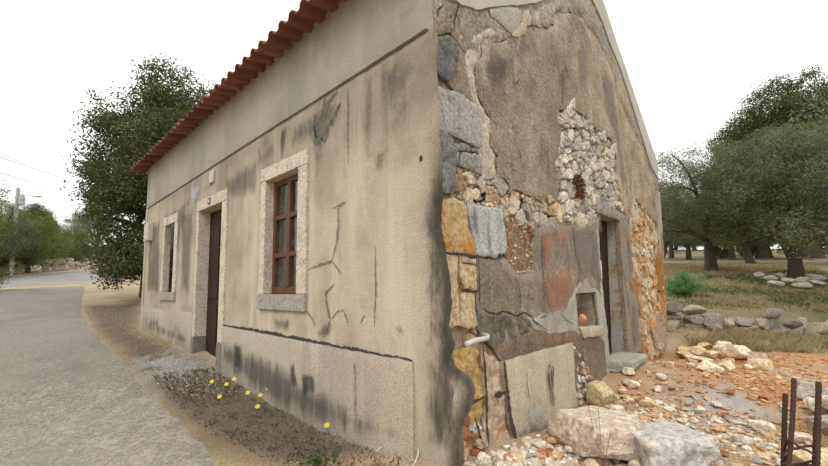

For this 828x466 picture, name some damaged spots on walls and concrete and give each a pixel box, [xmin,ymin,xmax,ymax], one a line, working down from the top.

flaking render [449,98,668,361]
crack [223,202,412,362]
crack [446,252,573,331]
water stain [228,347,327,419]
flaking render [462,415,489,462]